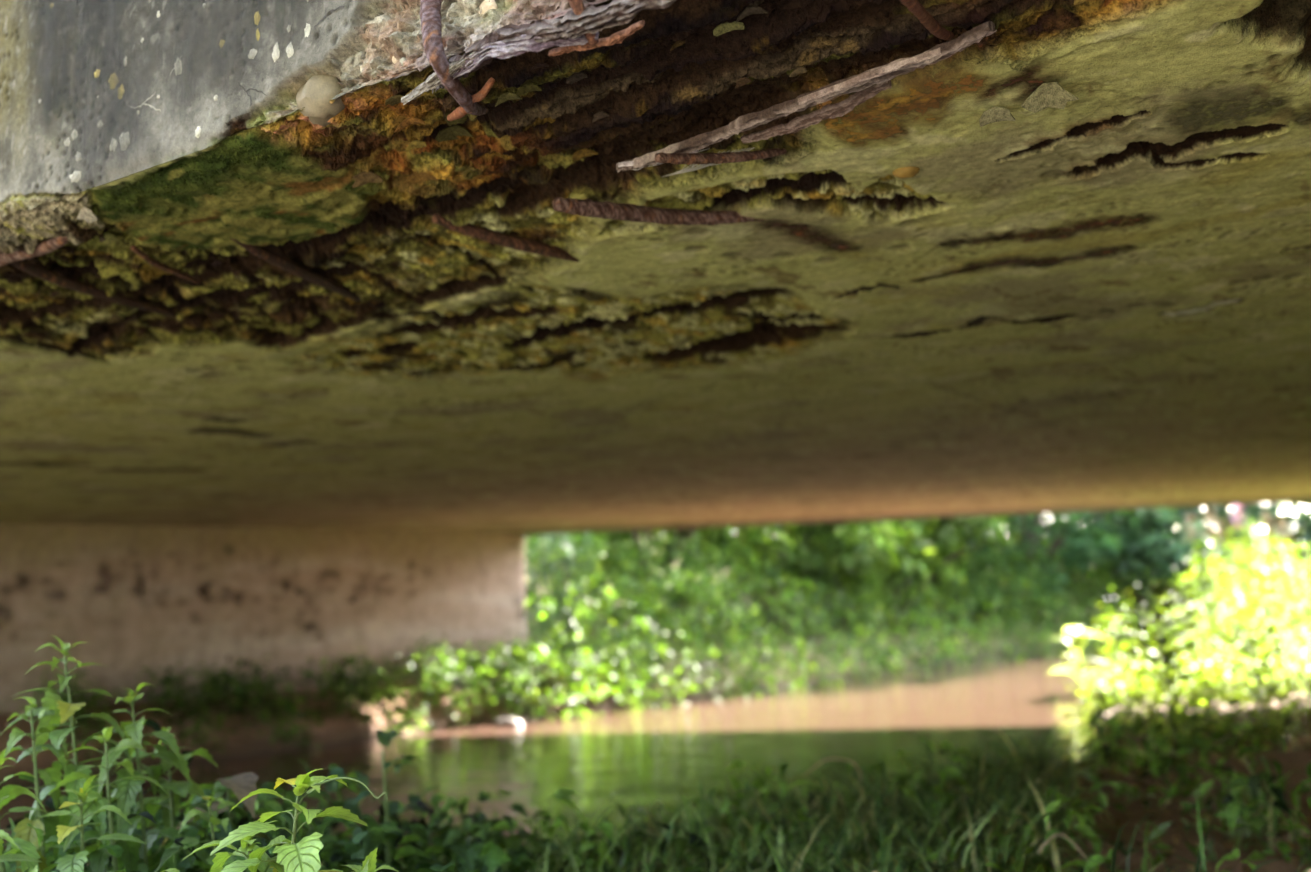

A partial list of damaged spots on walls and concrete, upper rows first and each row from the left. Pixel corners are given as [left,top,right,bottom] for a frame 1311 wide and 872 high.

spalling [1224,0,1311,72]
corrosion [811,26,1059,145]
crack [994,109,1291,180]
spalling [0,0,1176,362]
corrosion [760,220,860,252]